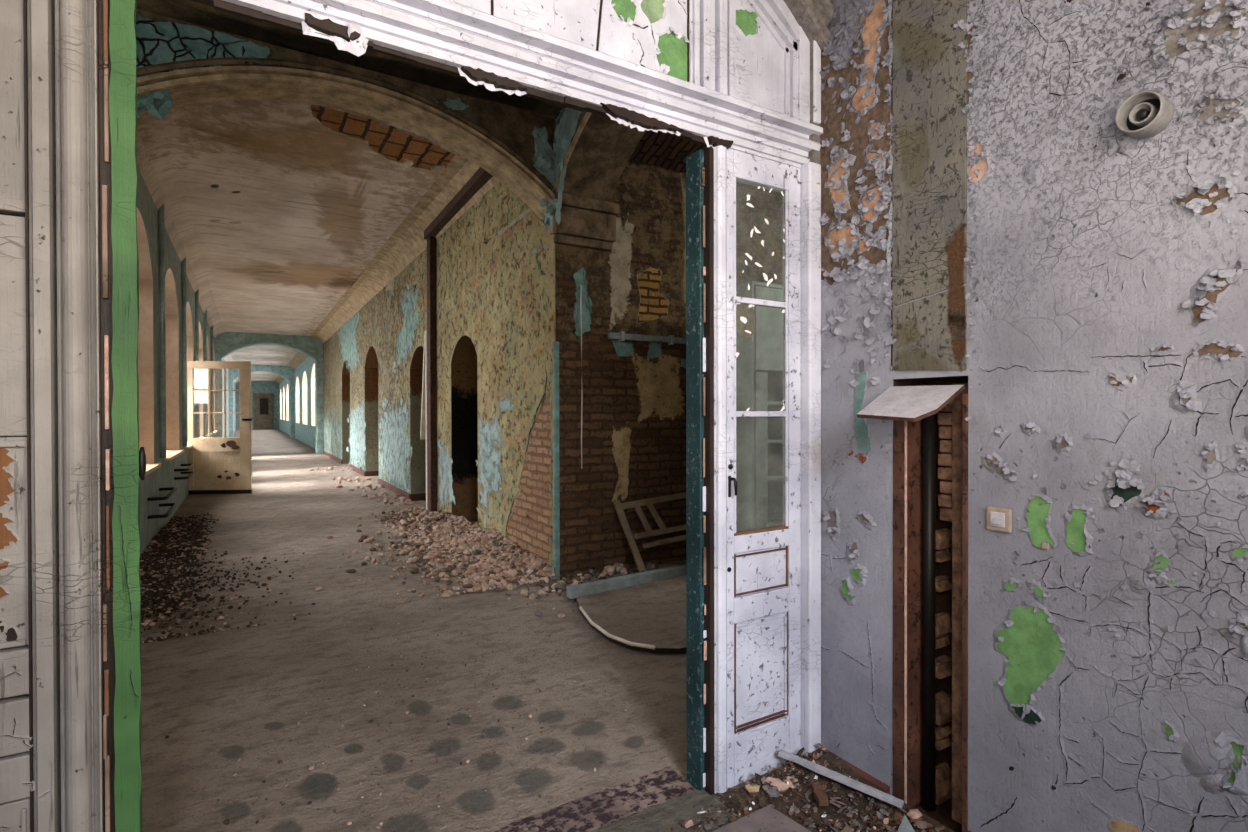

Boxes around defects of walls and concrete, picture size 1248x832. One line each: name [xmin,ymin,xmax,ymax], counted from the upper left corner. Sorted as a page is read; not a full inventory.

peeling [301,13,368,57]
peeling [608,0,695,81]
spalling [308,105,456,173]
peeling [819,0,896,465]
peeling [954,0,1248,388]
crack [1090,248,1148,292]
crack [977,349,1248,459]
peeling [438,440,455,510]
spalling [476,392,553,566]
peeling [980,452,1248,728]
crack [1019,521,1248,832]
crack [976,794,1021,832]